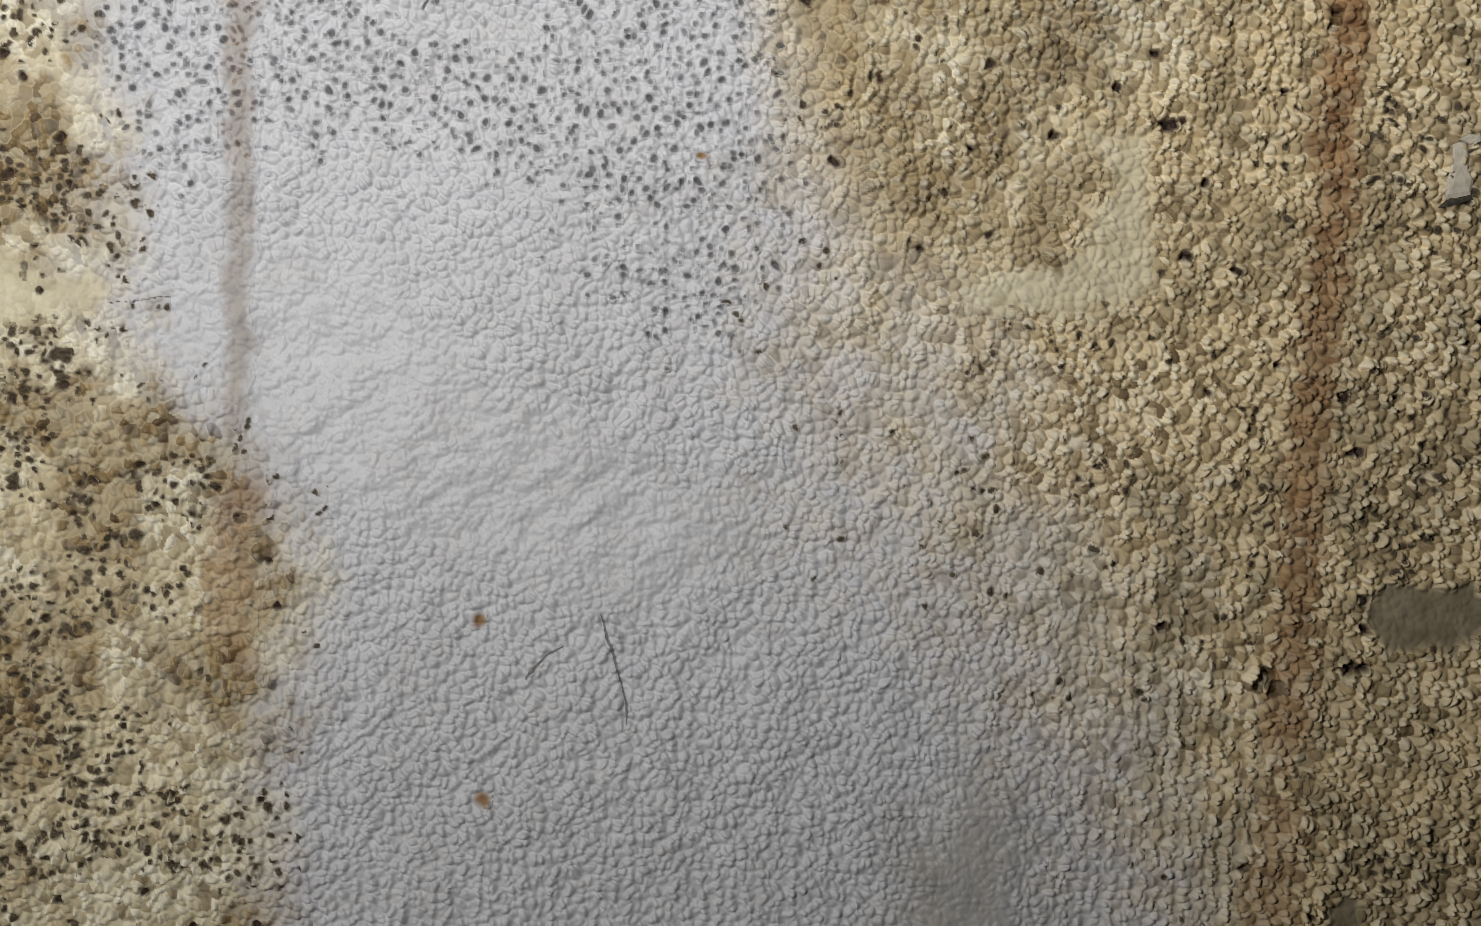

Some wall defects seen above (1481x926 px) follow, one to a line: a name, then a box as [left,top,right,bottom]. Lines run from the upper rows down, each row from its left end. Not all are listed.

spalling [1112,80,1123,95]
leakage [1231,77,1307,188]
leakage [1364,85,1481,274]
spalling [1230,265,1246,278]
leakage [0,0,361,926]
leakage [953,435,1002,516]
corrosion [1231,0,1386,926]
spalling [1345,446,1366,460]
leakage [1340,428,1481,584]
spalling [1155,621,1168,633]
spalling [1338,580,1481,680]
leakage [1339,818,1477,896]